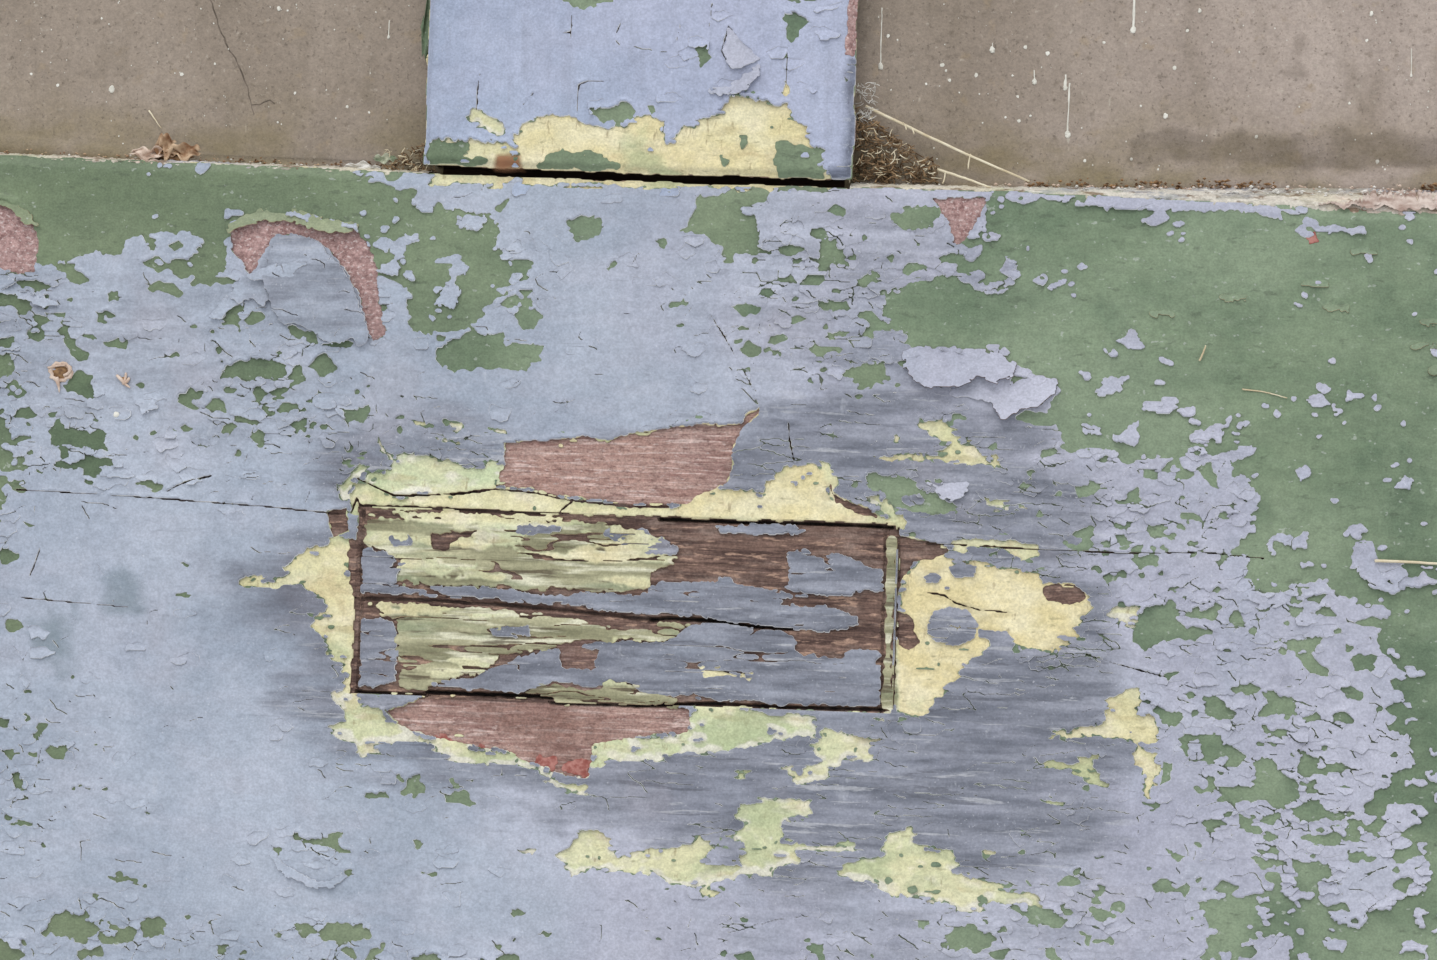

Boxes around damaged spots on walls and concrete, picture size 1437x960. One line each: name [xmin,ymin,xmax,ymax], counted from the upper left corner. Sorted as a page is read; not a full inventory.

crack [210,0,275,113]
peeling [423,27,832,180]
peeling [766,0,859,71]
peeling [554,215,604,242]
peeling [144,276,183,298]
crack [16,487,83,495]
peeling [873,404,1013,486]
peeling [0,603,59,659]
crack [133,475,1264,712]
peeling [0,670,100,878]
peeling [0,811,520,960]
peeling [555,794,1156,960]